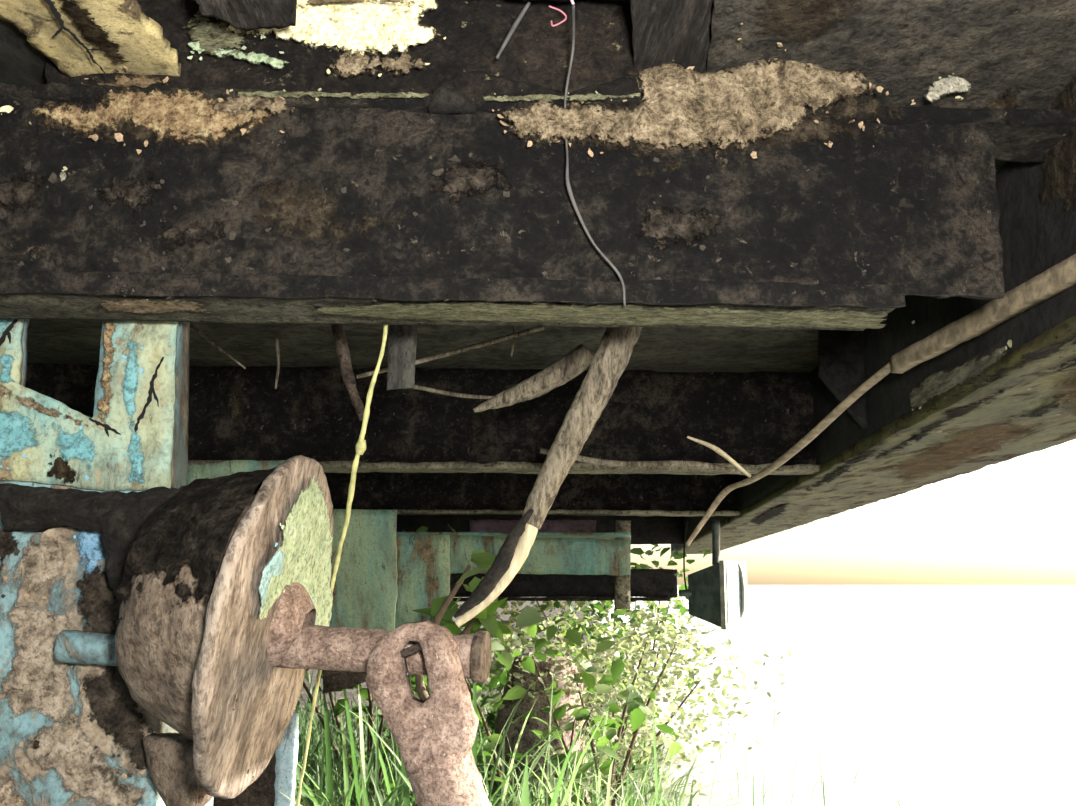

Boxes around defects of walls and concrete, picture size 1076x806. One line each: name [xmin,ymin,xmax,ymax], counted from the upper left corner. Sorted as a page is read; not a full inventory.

crack [44,0,107,76]
peeling [183,0,446,77]
peeling [229,88,429,101]
peeling [0,319,15,383]
crack [0,319,18,346]
peeling [0,410,95,480]
crack [89,357,164,437]
peeling [121,341,145,483]
peeling [74,531,104,574]